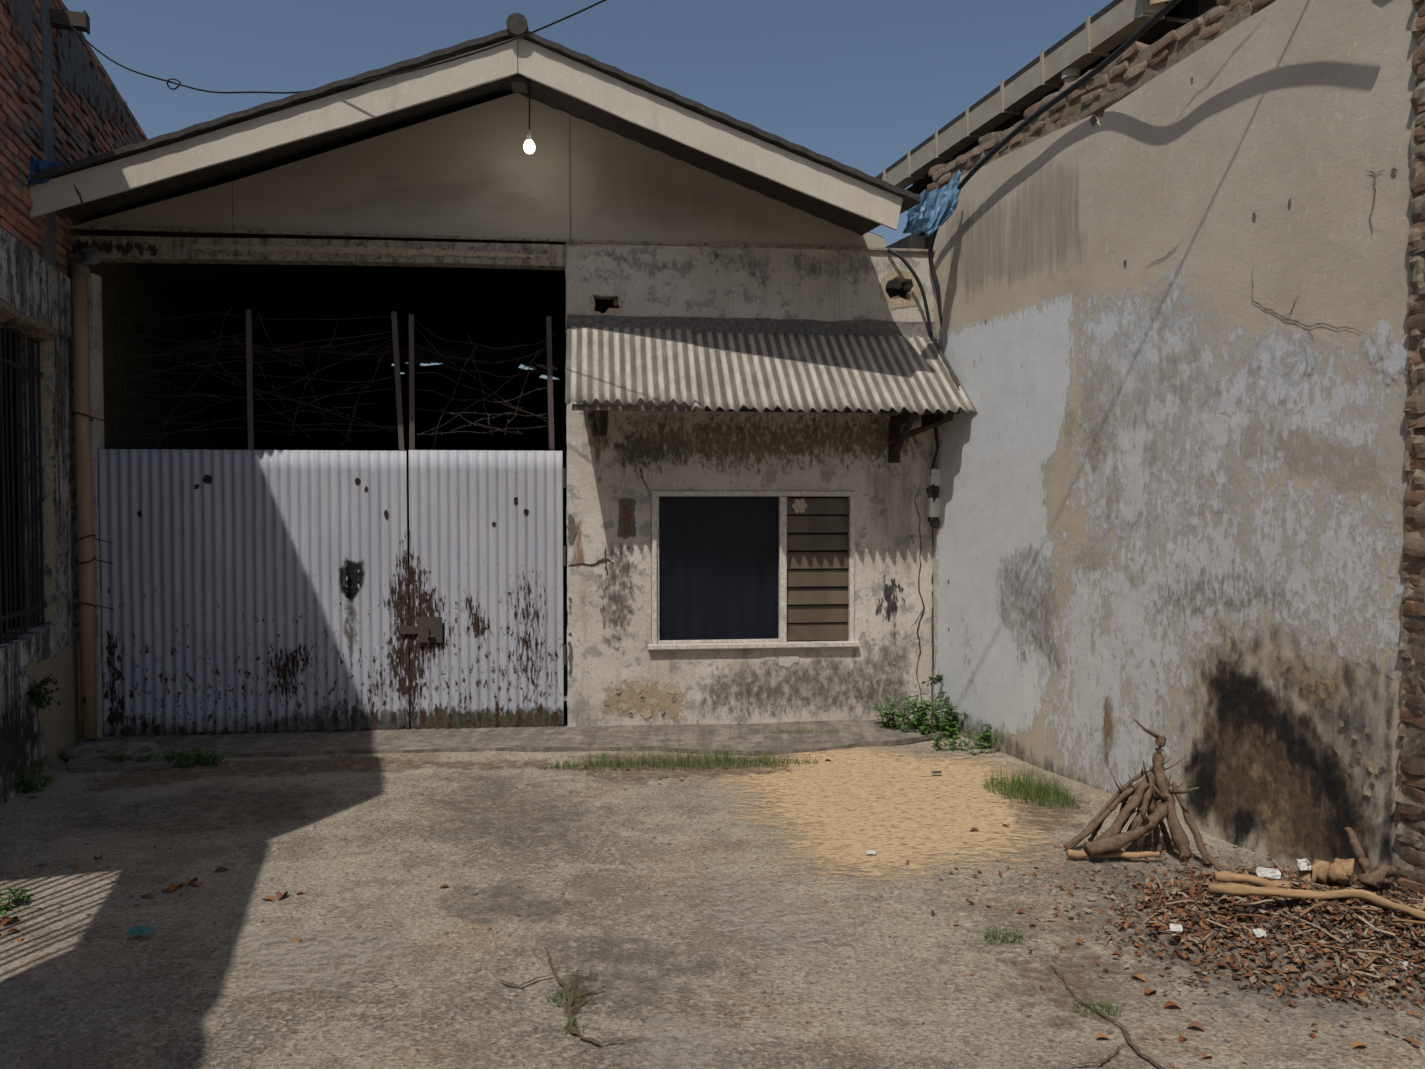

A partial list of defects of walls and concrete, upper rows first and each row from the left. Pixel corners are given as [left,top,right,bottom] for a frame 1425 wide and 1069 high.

crack [1367,170,1384,233]
crack [1252,270,1370,337]
peeling [934,105,1425,808]
leakage [0,675,39,783]
rust [102,630,131,728]
rust [264,640,317,707]
rust [356,531,555,729]
leakage [600,544,638,654]
leakage [602,575,914,721]
spalling [1334,719,1425,895]